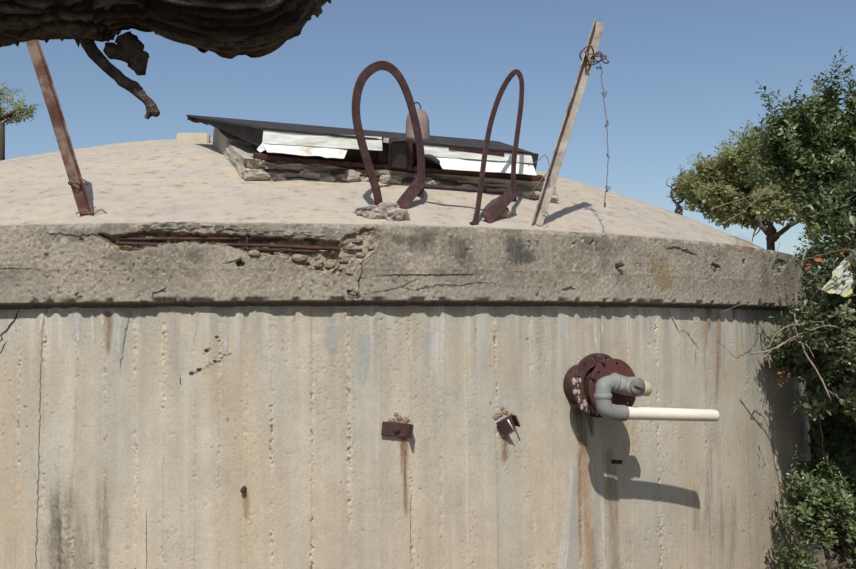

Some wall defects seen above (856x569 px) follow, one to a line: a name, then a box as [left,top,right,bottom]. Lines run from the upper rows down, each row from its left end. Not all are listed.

spalling [96,222,380,276]
crack [0,312,18,353]
crack [34,314,44,567]